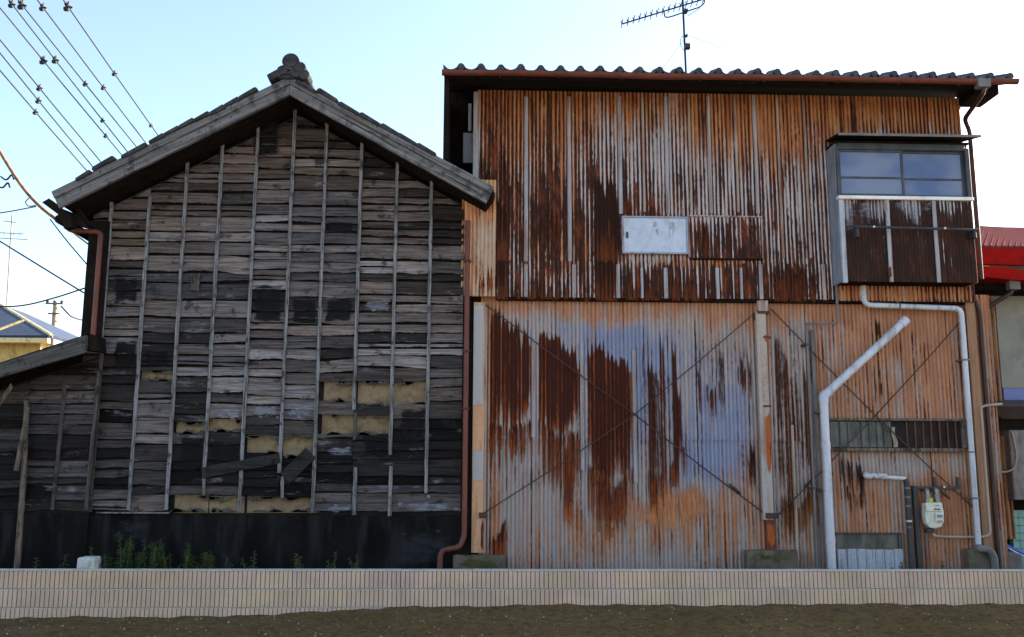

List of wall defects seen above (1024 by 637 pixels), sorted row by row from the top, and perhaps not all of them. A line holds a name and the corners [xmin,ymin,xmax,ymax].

corrosion [766,263,828,302]
corrosion [480,143,708,546]
peeling [176,381,426,458]
corrosion [747,334,813,550]
peeling [170,495,319,513]
corrosion [840,459,865,513]